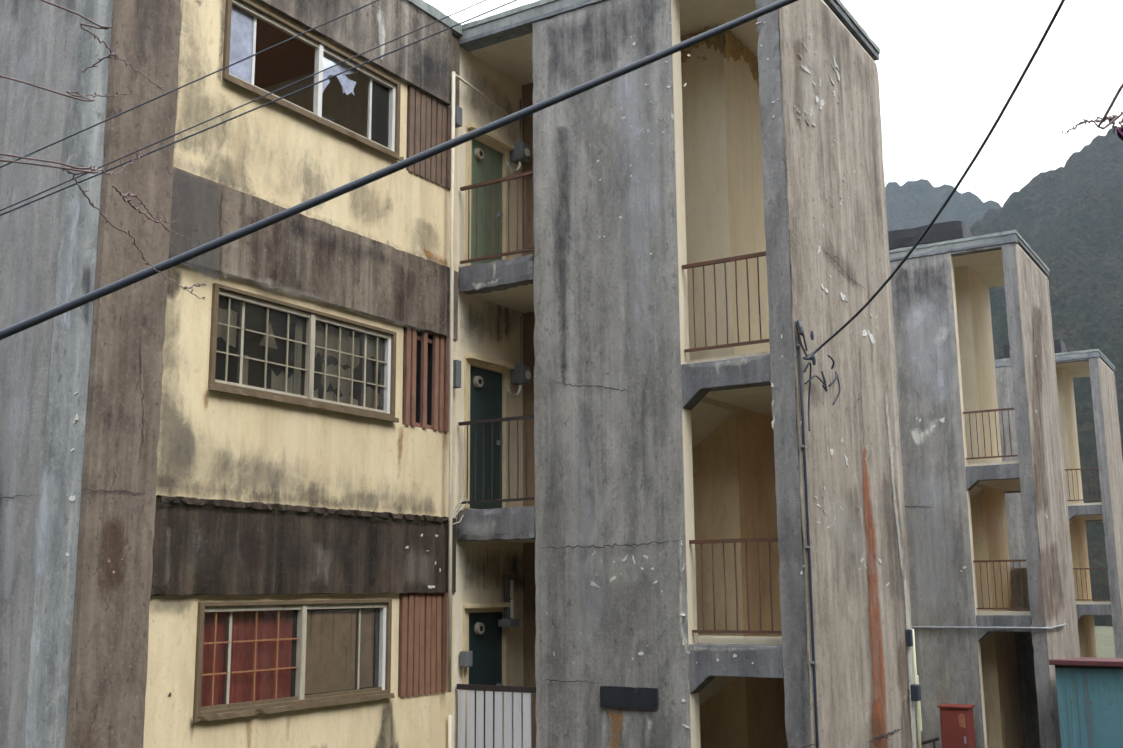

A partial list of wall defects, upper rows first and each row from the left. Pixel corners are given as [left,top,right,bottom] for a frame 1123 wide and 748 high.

damp [63,202,90,328]
damp [160,405,199,489]
spalling [911,417,945,445]
damp [221,460,290,501]
damp [103,521,123,585]
crack [545,540,678,555]
corrosion [863,450,887,748]
damp [376,705,398,748]